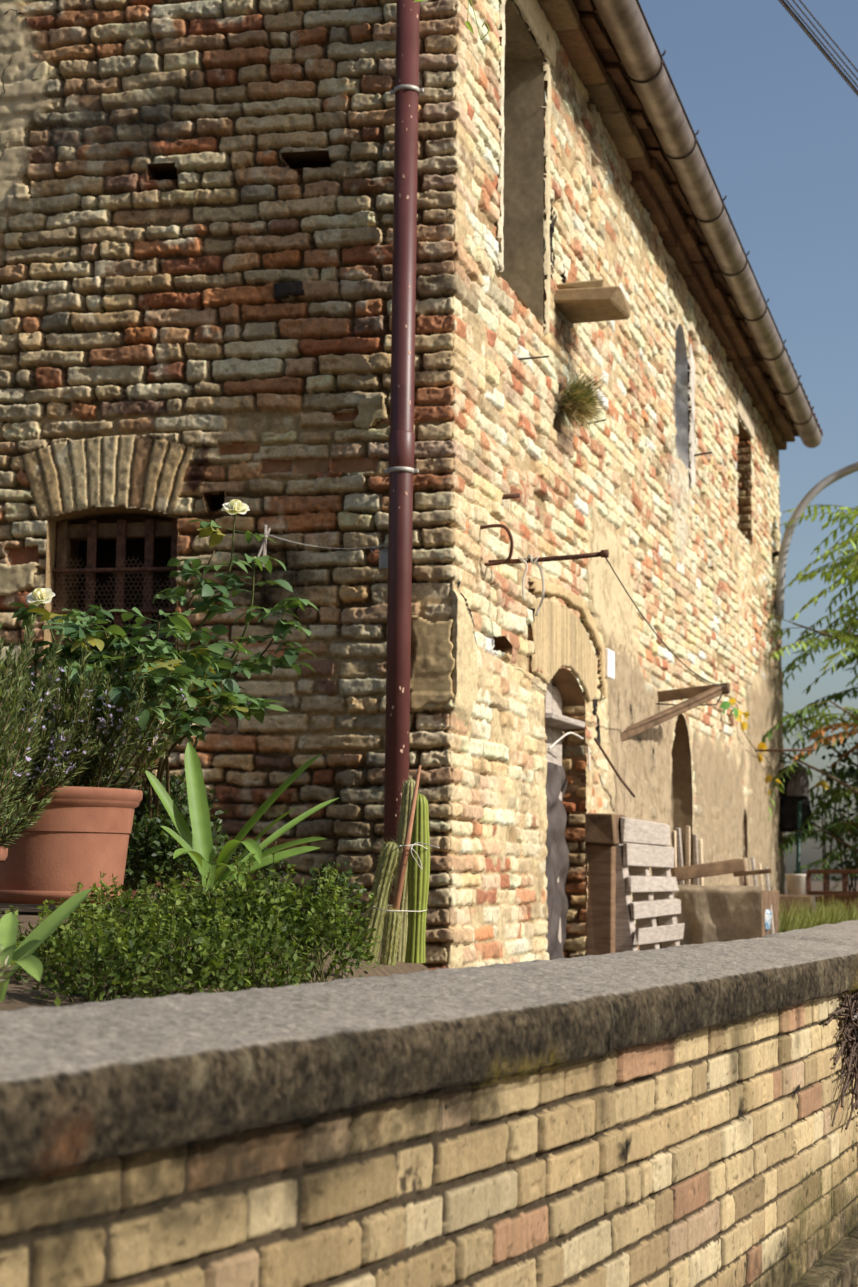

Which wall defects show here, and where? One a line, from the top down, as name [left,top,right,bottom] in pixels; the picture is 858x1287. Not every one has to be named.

peeling [0,0,51,259]
spalling [0,545,41,596]